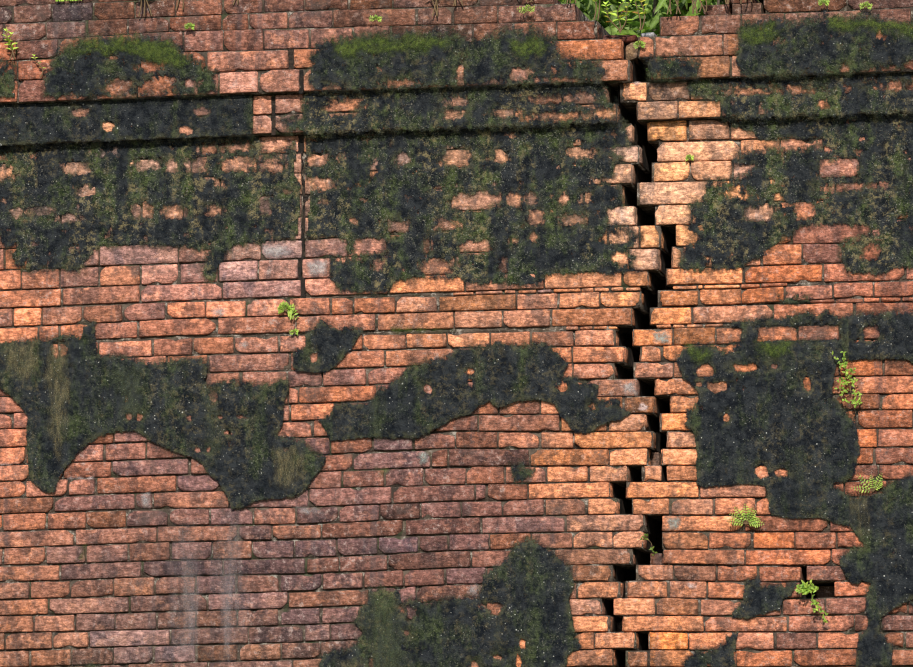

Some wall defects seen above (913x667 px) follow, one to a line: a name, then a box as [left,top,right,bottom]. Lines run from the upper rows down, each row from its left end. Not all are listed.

crack [605,42,677,667]